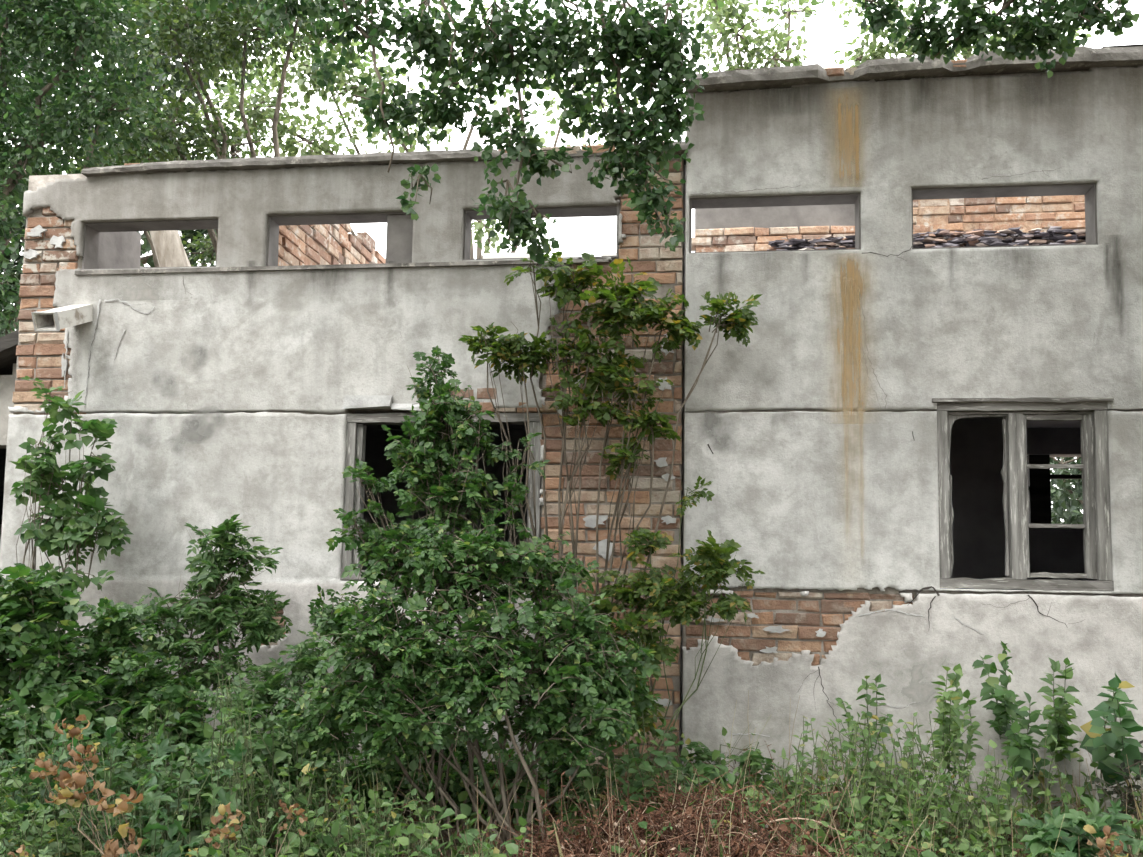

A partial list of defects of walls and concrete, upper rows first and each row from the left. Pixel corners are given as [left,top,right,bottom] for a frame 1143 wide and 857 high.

corrosion [836,92,860,180]
flaking render [12,207,164,415]
corrosion [837,258,865,419]
flaking render [540,160,925,784]
crack [899,586,940,628]
crack [988,594,1079,628]